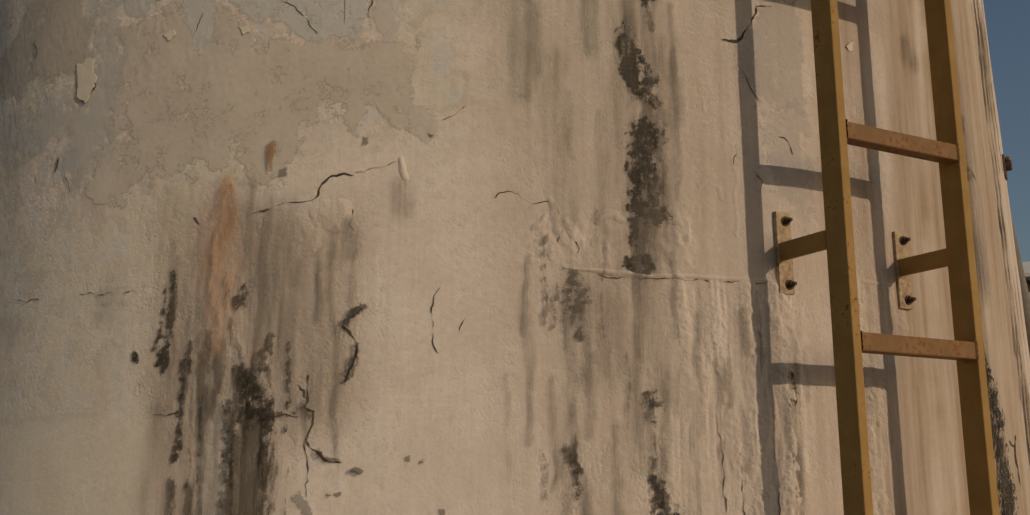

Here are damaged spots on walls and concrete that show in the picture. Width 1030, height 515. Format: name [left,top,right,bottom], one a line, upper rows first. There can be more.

peeling [77,0,465,209]
crack [250,161,397,215]
leakage [615,21,680,279]
leakage [976,0,1030,441]
leakage [151,270,296,515]
crack [254,374,363,497]
crack [337,303,367,383]
leakage [555,436,592,515]
leakage [562,270,592,342]
mould [642,390,663,410]
leakage [649,456,686,515]
leakage [984,353,1019,515]